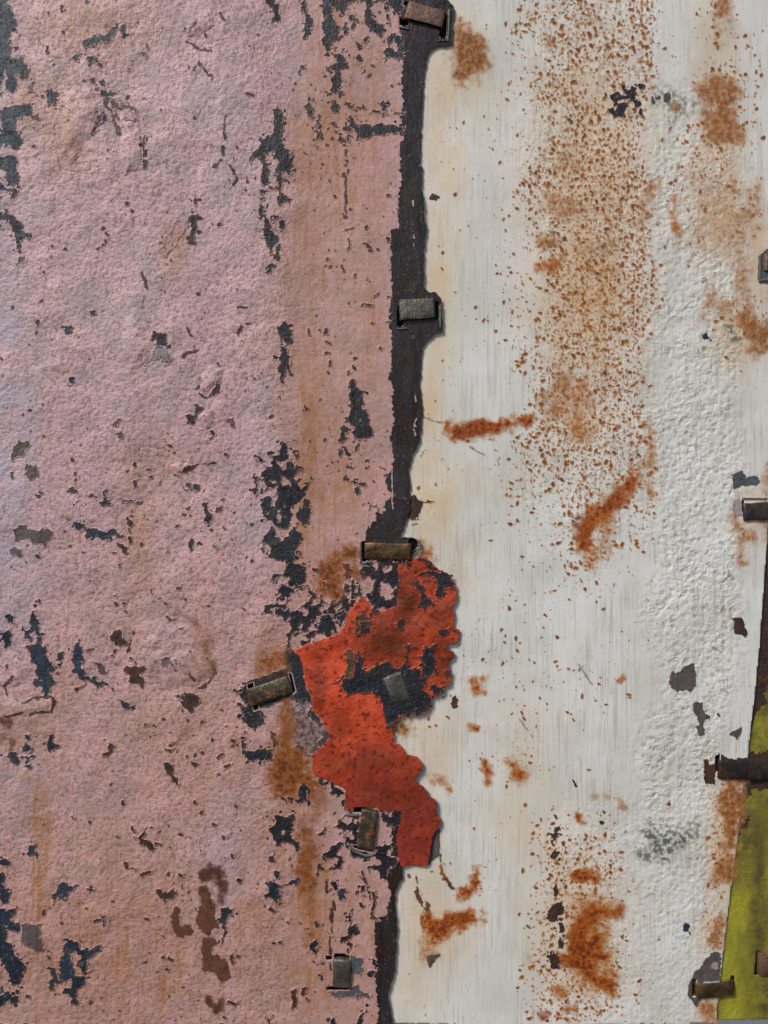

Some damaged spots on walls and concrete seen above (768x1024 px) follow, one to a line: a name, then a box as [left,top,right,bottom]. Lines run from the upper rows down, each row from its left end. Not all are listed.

peeling [0,0,60,264]
peeling [248,104,296,275]
corrosion [443,0,768,652]
peeling [337,363,394,512]
corrosion [267,698,327,807]
peeling [216,440,458,776]
corrosion [458,628,602,728]
peeling [0,856,95,1007]
peeling [47,937,107,1006]
corrosion [420,866,486,959]
corrosion [516,806,654,1022]
corrosion [702,779,747,966]